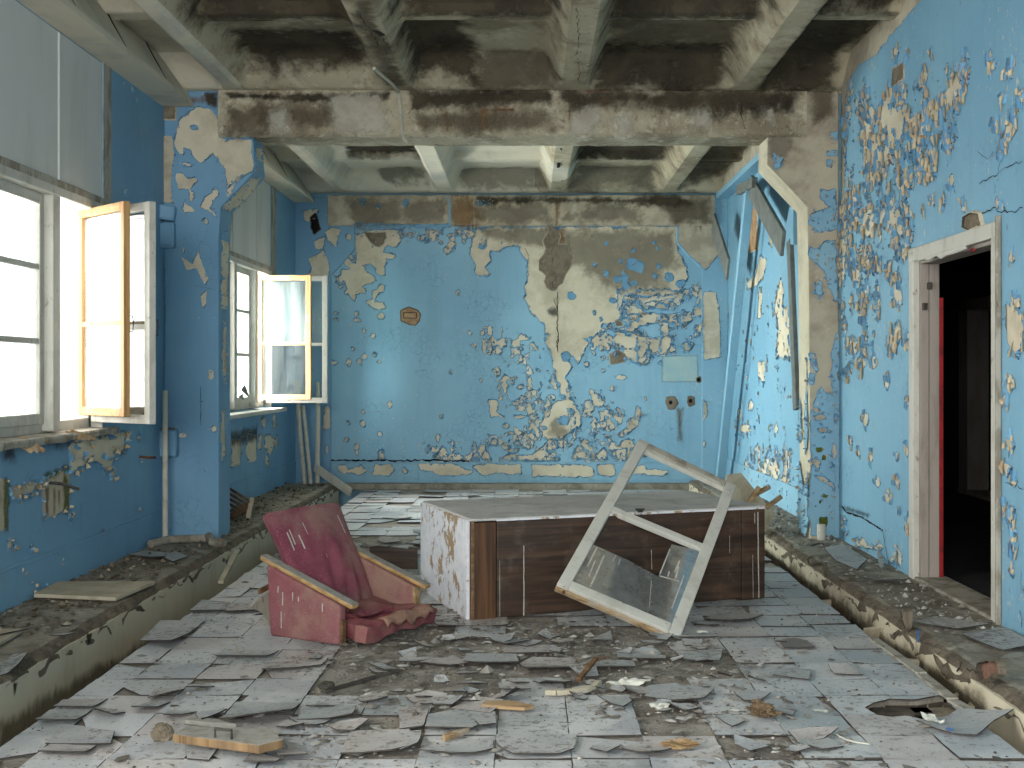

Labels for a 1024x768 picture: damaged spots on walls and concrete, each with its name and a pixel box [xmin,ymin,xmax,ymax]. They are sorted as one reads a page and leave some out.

peeling [164,106,264,225]
damp [186,0,894,290]
peeling [985,48,1024,162]
peeling [180,226,232,385]
peeling [303,208,732,479]
flaking render [734,0,985,569]
peeling [1002,289,1024,360]
peeling [0,429,141,555]
crack [331,456,469,464]
crack [842,506,890,566]
peeling [995,428,1019,579]
spalling [765,528,1024,732]